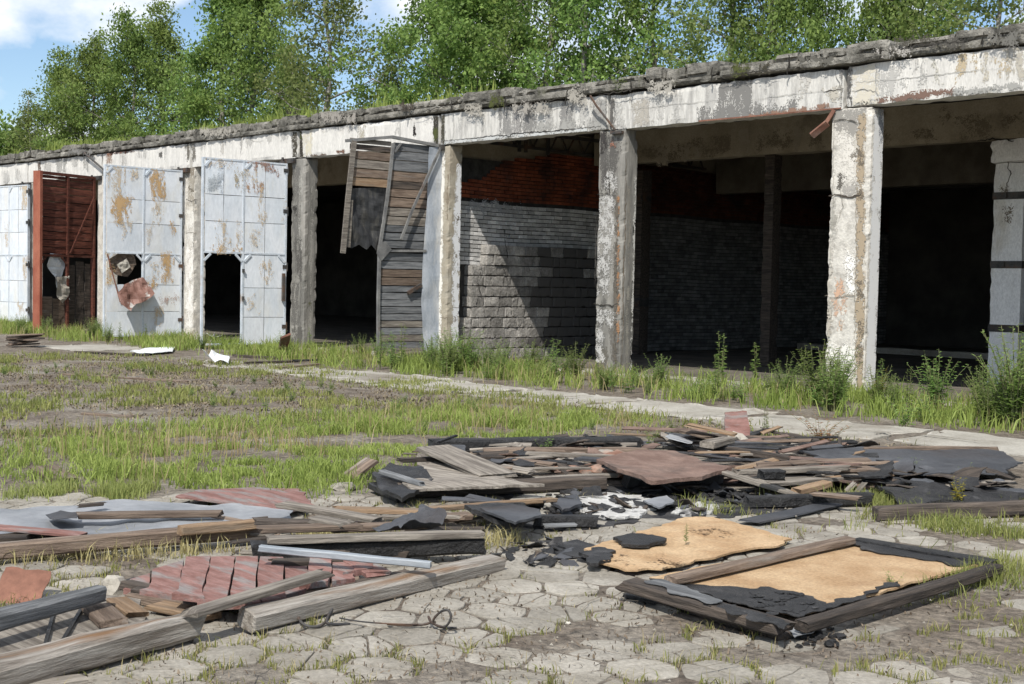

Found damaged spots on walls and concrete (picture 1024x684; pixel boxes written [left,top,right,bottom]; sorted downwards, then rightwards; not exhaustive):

peeling [318,110,356,124]
peeling [463,103,483,119]
peeling [512,100,551,115]
spalling [567,87,588,107]
spalling [647,79,676,95]
corrosion [107,165,176,244]
corrosion [206,159,279,285]
spalling [821,44,1023,387]
corrosion [146,251,181,326]
peeling [595,170,636,370]